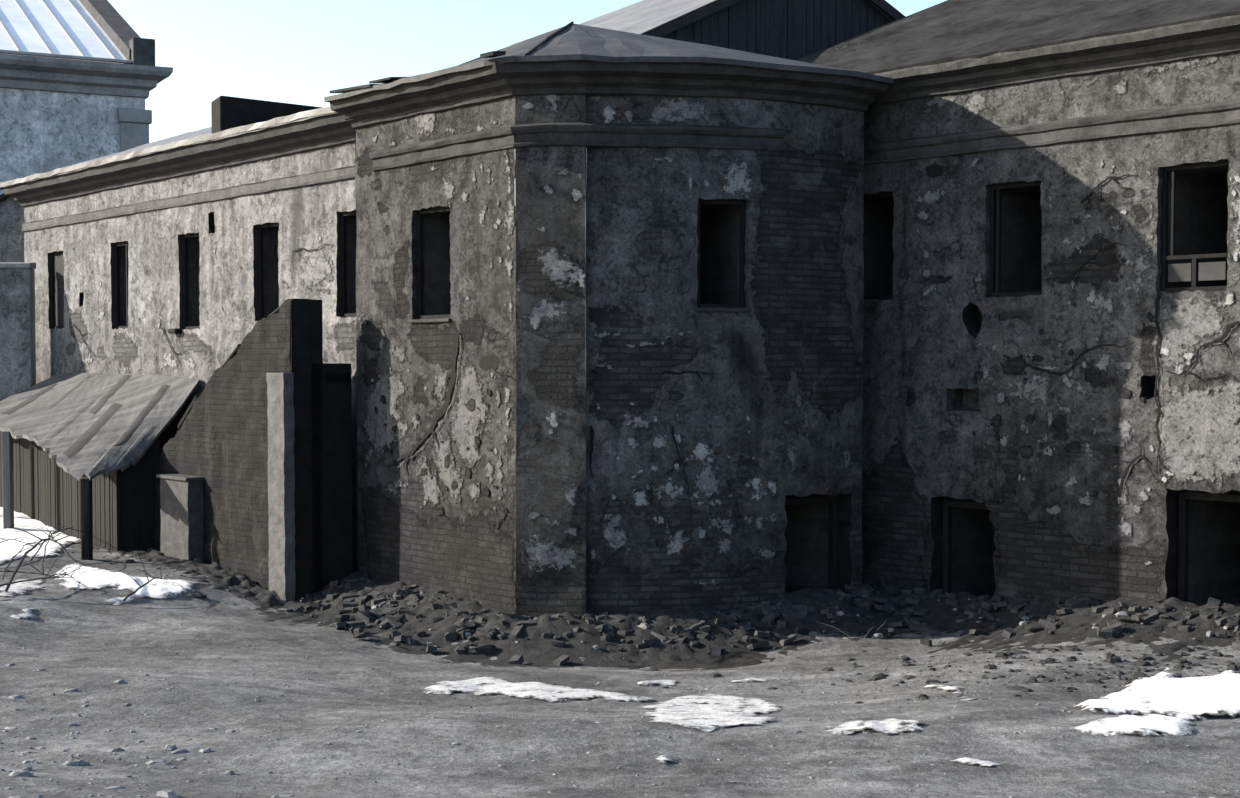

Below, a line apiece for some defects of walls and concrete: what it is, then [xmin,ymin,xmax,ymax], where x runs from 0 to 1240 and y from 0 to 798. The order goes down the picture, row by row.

crack [387,332,461,474]
spalling [688,138,863,472]
peeling [915,162,961,307]
crack [1059,174,1140,289]
peeling [962,159,1240,602]
crack [1024,291,1240,498]